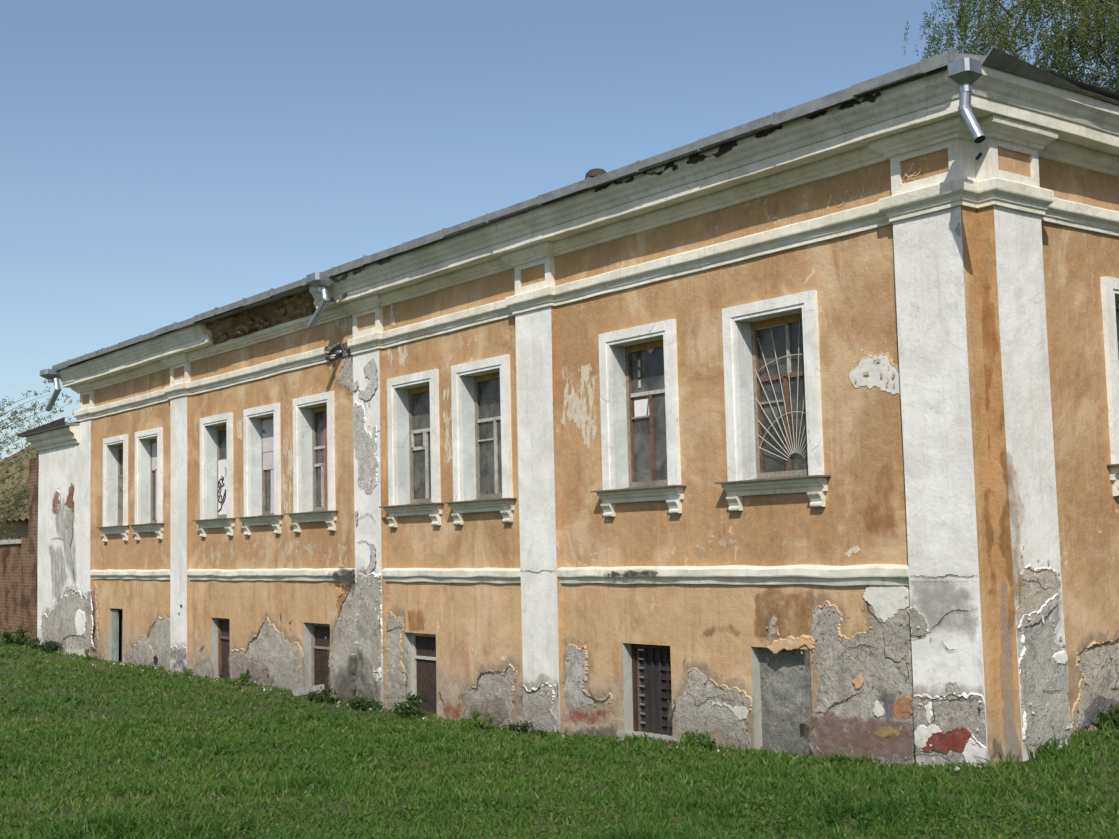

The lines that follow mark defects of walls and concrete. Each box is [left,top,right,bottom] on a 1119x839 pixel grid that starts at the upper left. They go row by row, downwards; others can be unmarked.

peeling [672,140,737,171]
peeling [334,344,408,494]
peeling [561,363,597,450]
peeling [841,350,901,396]
flaking render [52,482,74,546]
flaking render [40,579,103,659]
flaking render [125,604,212,678]
flaking render [208,537,406,710]
flaking render [463,636,613,734]
flaking render [668,656,753,750]
flaking render [761,585,988,768]
flaking render [1015,546,1119,750]